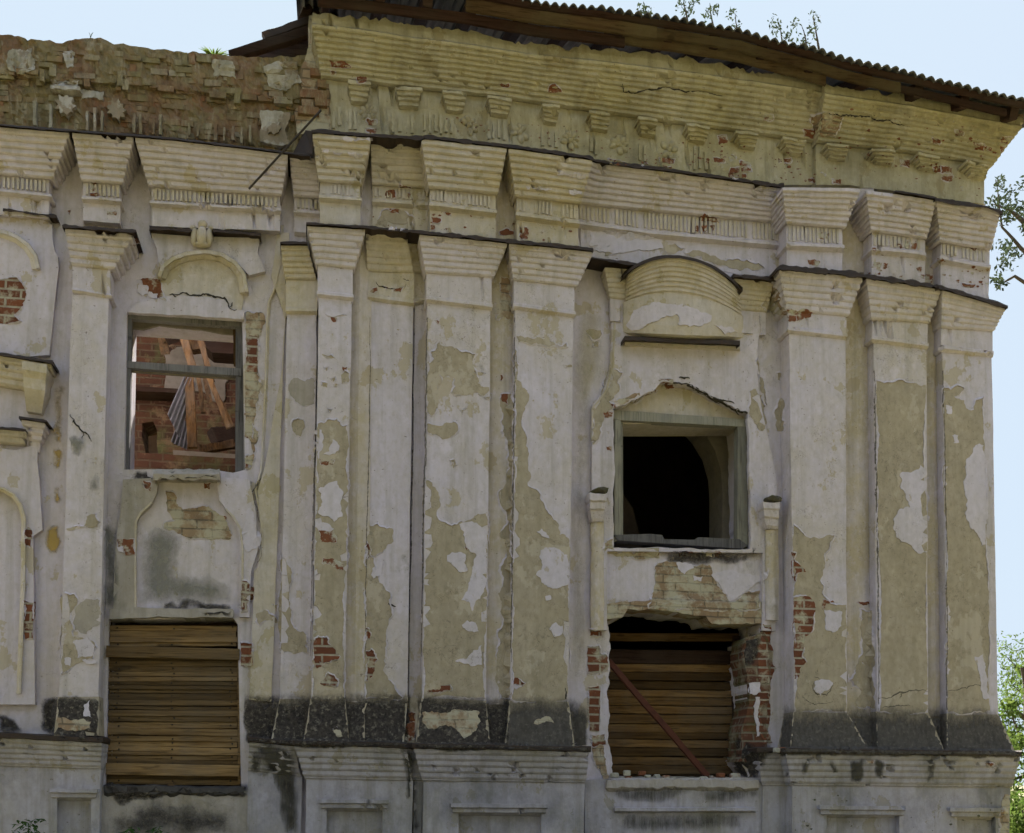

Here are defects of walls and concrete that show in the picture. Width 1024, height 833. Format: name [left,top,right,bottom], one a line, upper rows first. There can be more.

crack [621,84,722,96]
crack [829,113,909,127]
flaking render [0,276,26,325]
crack [169,292,237,311]
crack [70,414,91,440]
water stain [148,536,230,615]
peeling [420,336,571,704]
spalling [602,537,769,612]
peeling [790,378,992,716]
water stain [42,697,99,740]
water stain [244,695,588,831]
water stain [733,711,1018,781]